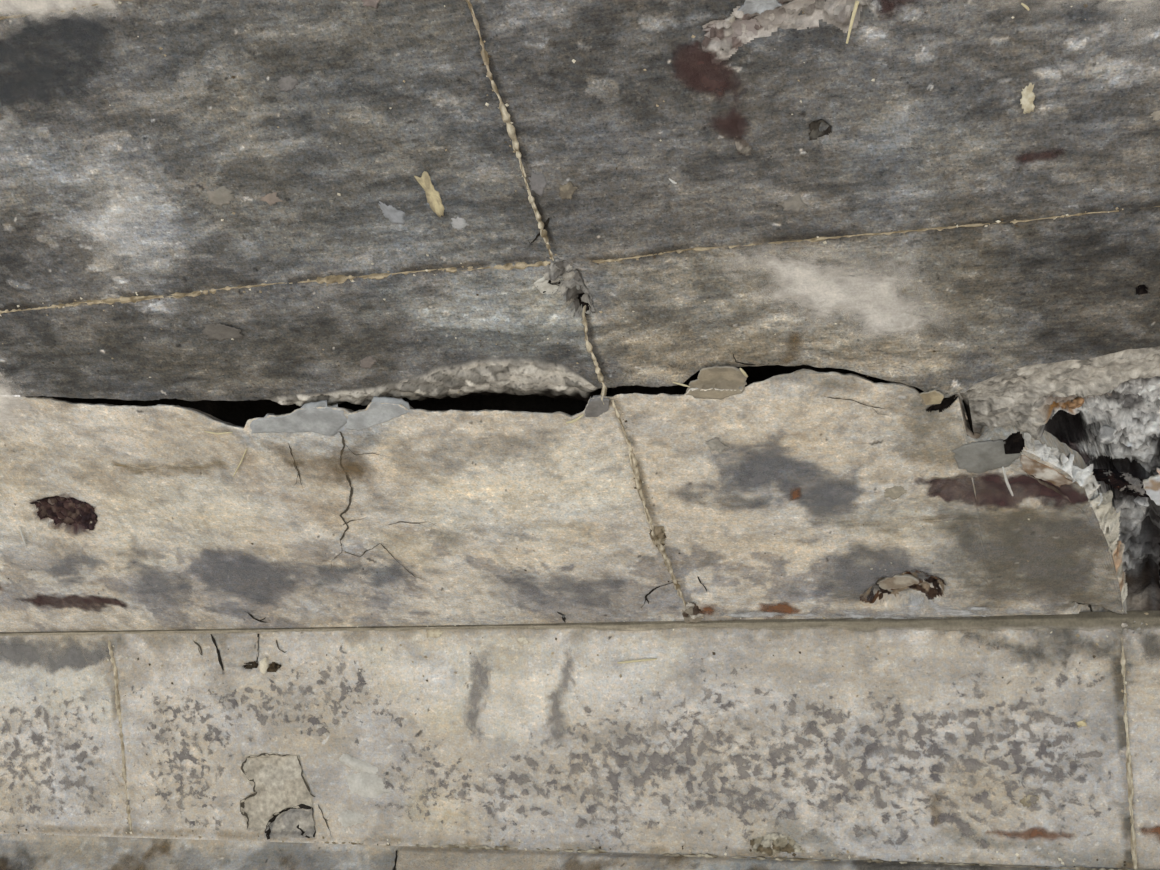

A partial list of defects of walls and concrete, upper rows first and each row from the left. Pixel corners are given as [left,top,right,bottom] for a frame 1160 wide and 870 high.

spalling [701,0,869,61]
corrosion [674,41,740,98]
crack [528,218,550,243]
crack [733,354,974,435]
crack [25,356,700,581]
spalling [954,346,1160,615]
corrosion [33,496,91,535]
corrosion [21,595,126,612]
crack [641,576,707,608]
spalling [860,569,946,604]
corrosion [987,828,1071,839]
corrosion [1141,826,1160,838]